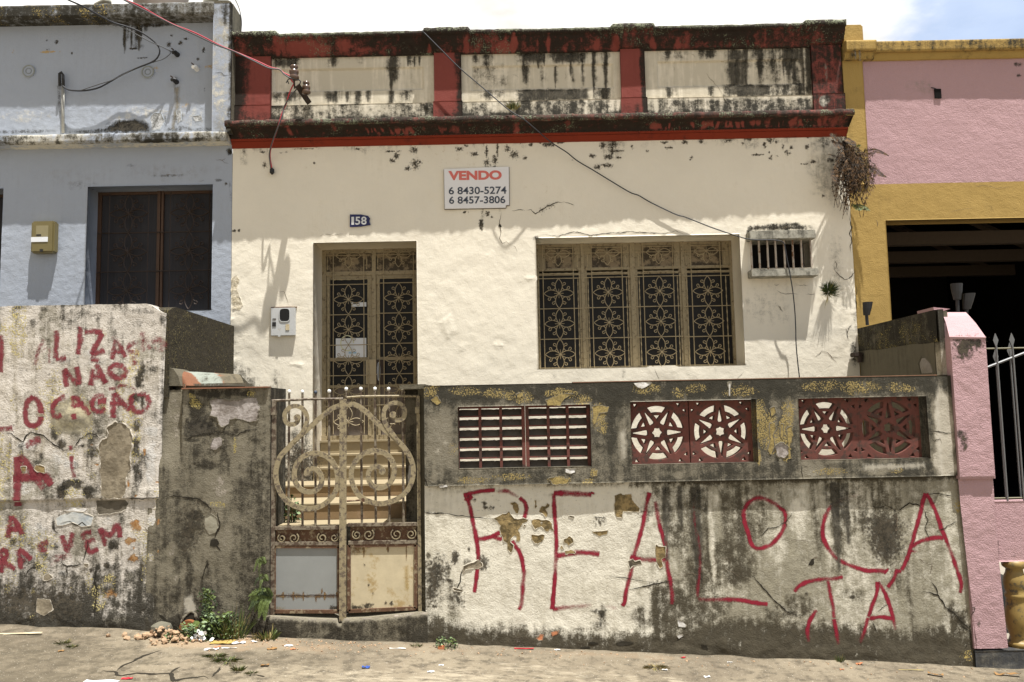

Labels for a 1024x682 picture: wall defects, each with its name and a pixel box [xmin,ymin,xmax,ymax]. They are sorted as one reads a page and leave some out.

water stain [522,52,607,101]
water stain [728,49,768,96]
crack [498,202,678,250]
flaking render [209,396,261,450]
flaking render [56,421,134,527]
peeling [492,500,576,555]
peeling [613,493,641,519]
water stain [662,485,708,580]
water stain [825,482,911,571]
rust [277,589,337,601]
crack [451,569,465,607]
crack [872,493,977,641]